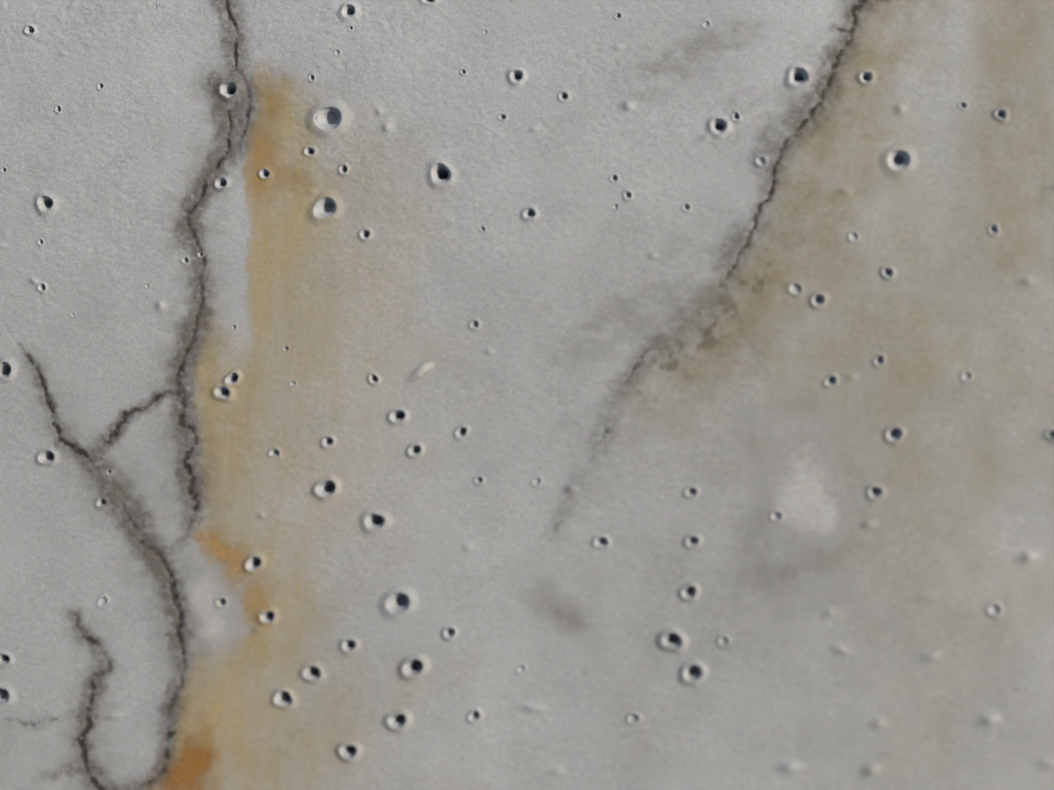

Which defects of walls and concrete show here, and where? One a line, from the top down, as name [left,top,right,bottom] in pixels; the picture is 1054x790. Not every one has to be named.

crack [721,0,873,284]
crack [27,0,254,790]
rust [164,696,225,790]